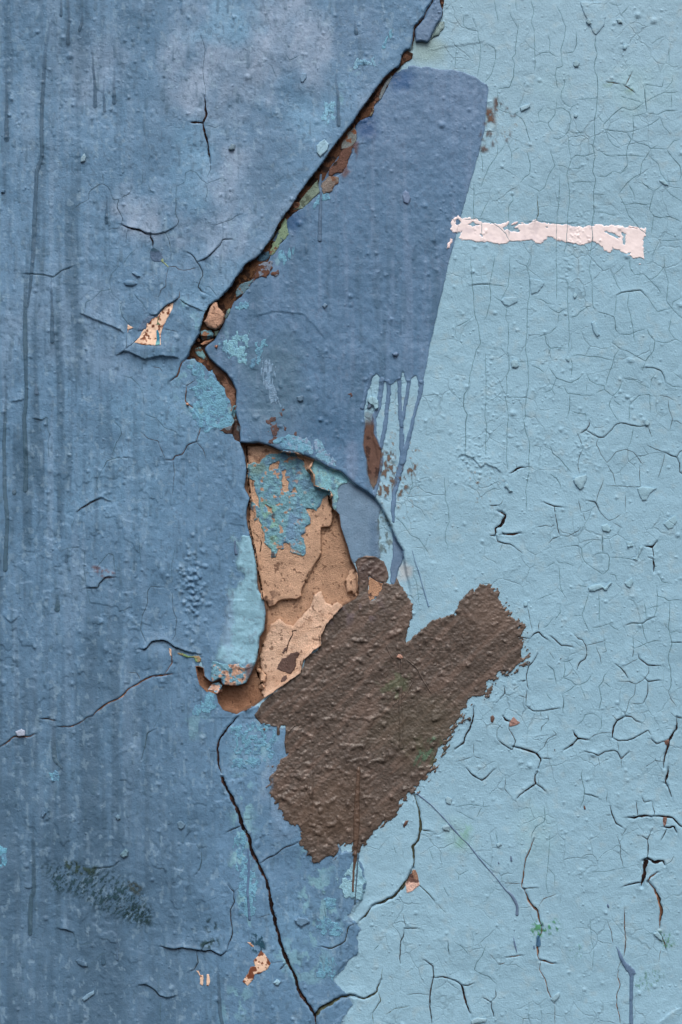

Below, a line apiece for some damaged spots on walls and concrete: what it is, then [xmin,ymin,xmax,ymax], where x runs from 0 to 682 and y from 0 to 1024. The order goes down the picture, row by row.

peeling [127,303,173,345]
crack [64,0,433,602]
spalling [169,331,359,770]
crack [169,2,682,1024]
peeling [242,942,271,986]